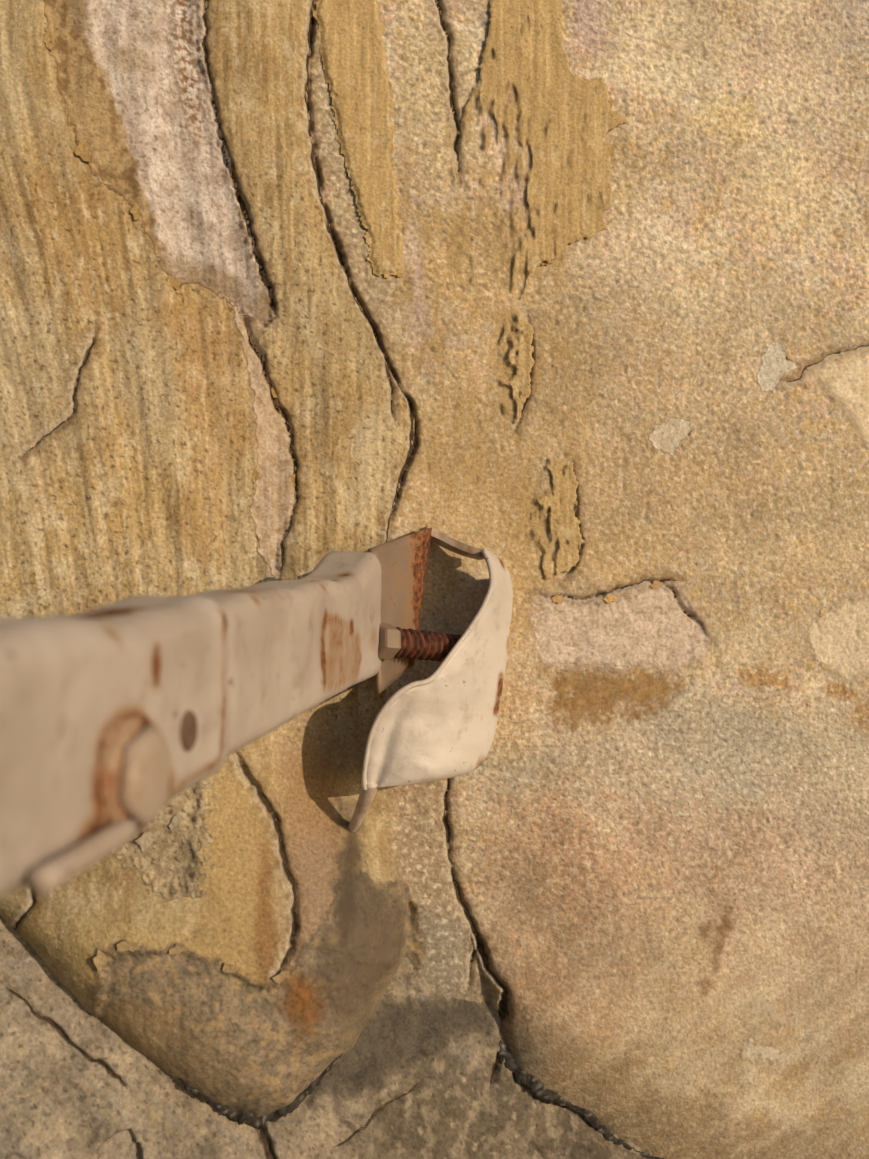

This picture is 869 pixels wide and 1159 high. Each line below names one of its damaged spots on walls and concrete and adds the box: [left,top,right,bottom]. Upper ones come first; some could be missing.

peeling [313,0,405,278]
crack [435,0,460,172]
peeling [461,0,628,298]
crack [30,338,94,450]
peeling [42,0,296,577]
crack [305,0,417,542]
peeling [502,312,534,423]
peeling [534,457,585,580]
peeling [531,580,710,676]
crack [443,778,508,1020]
crack [7,988,127,1088]
crack [258,1128,275,1159]